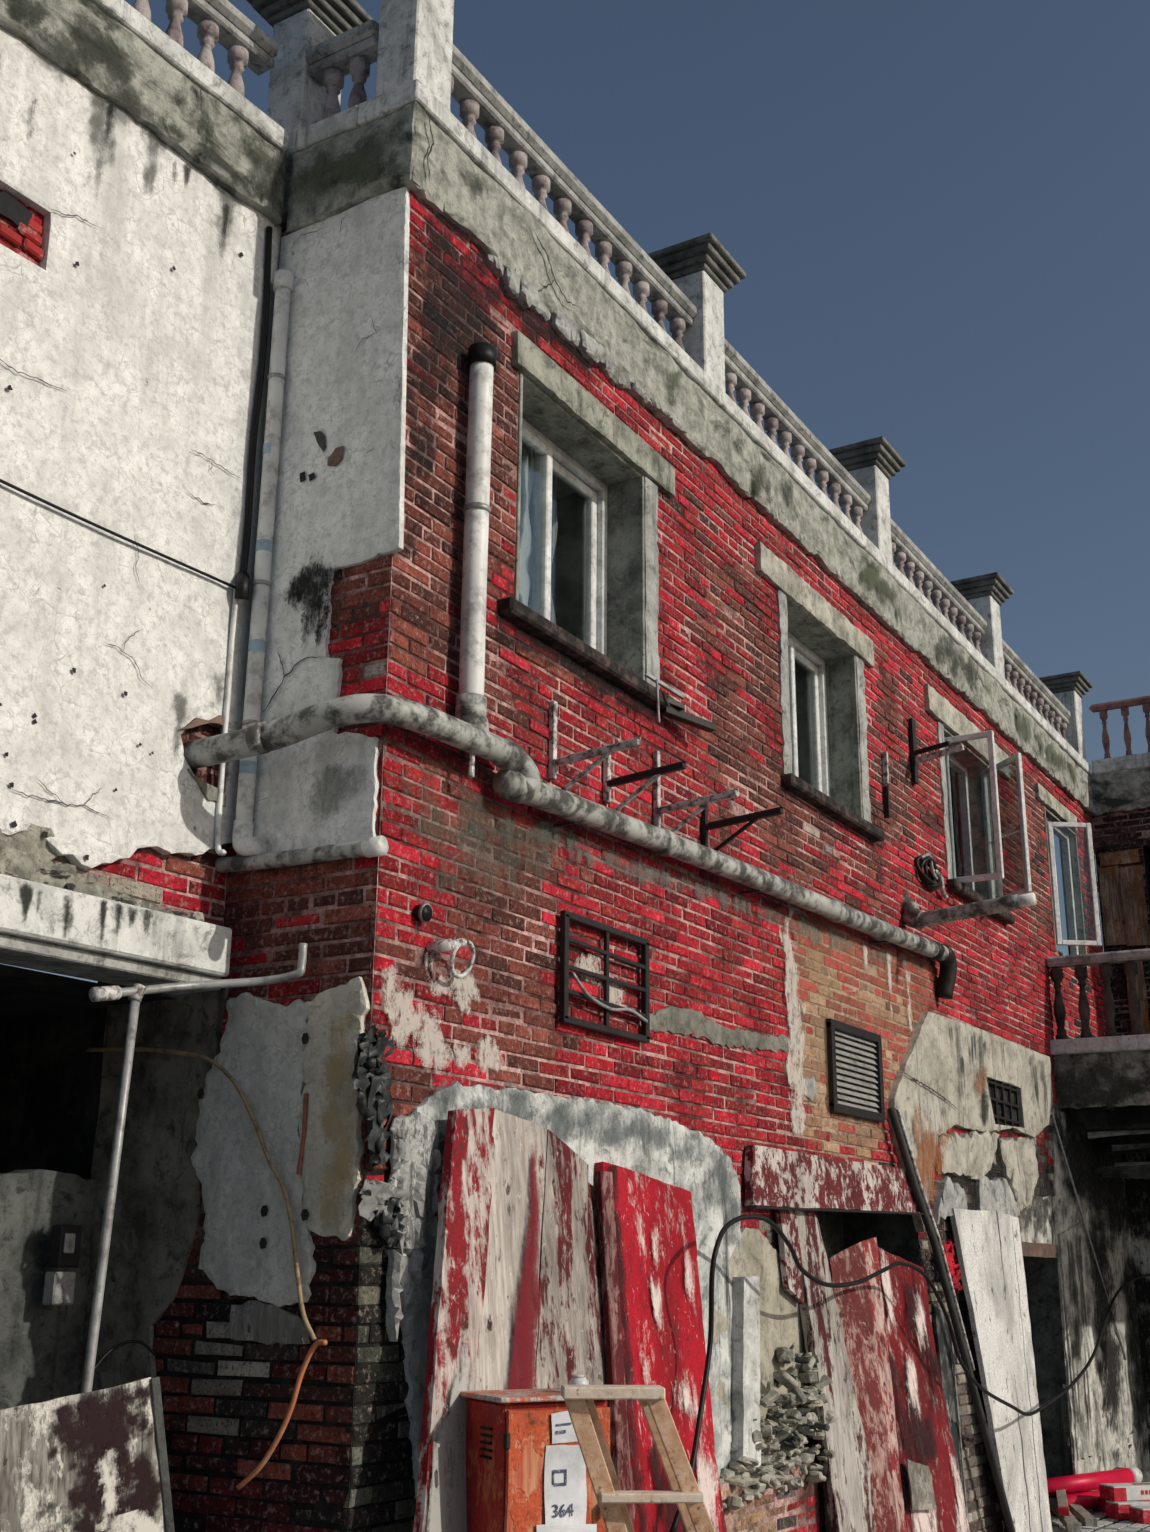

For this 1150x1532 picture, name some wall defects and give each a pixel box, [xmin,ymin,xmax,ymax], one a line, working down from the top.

leakage [88,0,120,28]
leakage [92,82,215,192]
leakage [218,173,267,248]
leakage [285,555,336,651]
leakage [20,884,41,919]
leakage [64,897,73,935]
spalling [0,820,205,922]
leakage [101,900,153,939]
leakage [944,1027,1005,1126]
peeling [191,976,371,1345]
leakage [1031,1054,1150,1463]